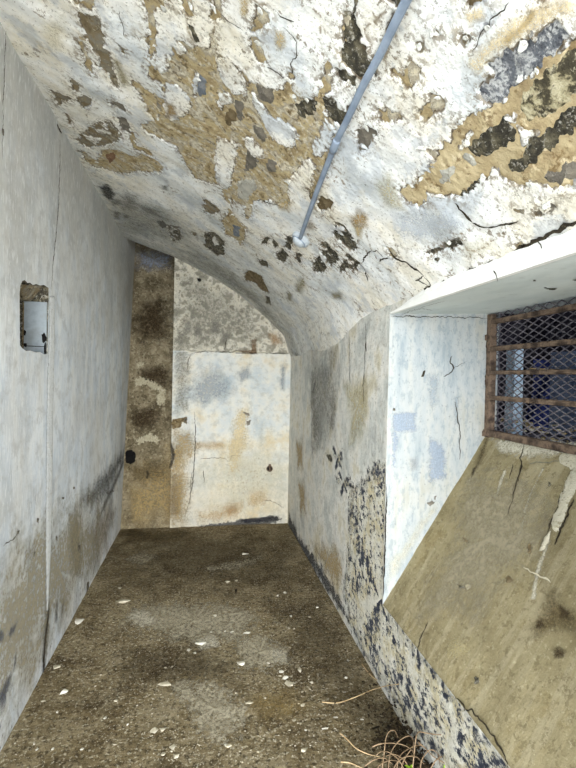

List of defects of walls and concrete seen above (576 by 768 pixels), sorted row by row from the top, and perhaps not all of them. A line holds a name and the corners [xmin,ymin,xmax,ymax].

crack [267,12,297,78]
flaking render [131,0,377,257]
flaking render [400,19,576,207]
flaking render [313,223,360,273]
crack [455,203,518,228]
crack [514,221,576,251]
spalling [20,280,49,354]
crack [360,249,498,319]
damp [137,368,167,385]
damp [132,407,161,433]
damp [128,431,198,540]
damp [426,442,547,611]